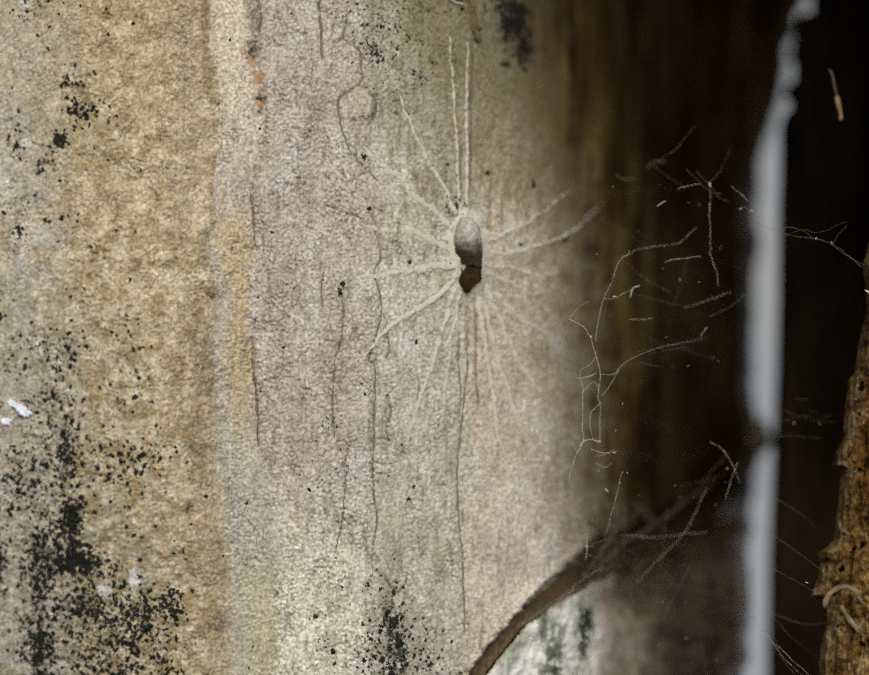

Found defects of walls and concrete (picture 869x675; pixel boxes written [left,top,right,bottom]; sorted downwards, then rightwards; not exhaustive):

leakage [317,0,464,115]
leakage [475,0,541,73]
leakage [0,309,198,675]
leakage [324,545,463,675]
crack [456,296,569,675]
crack [589,533,621,579]